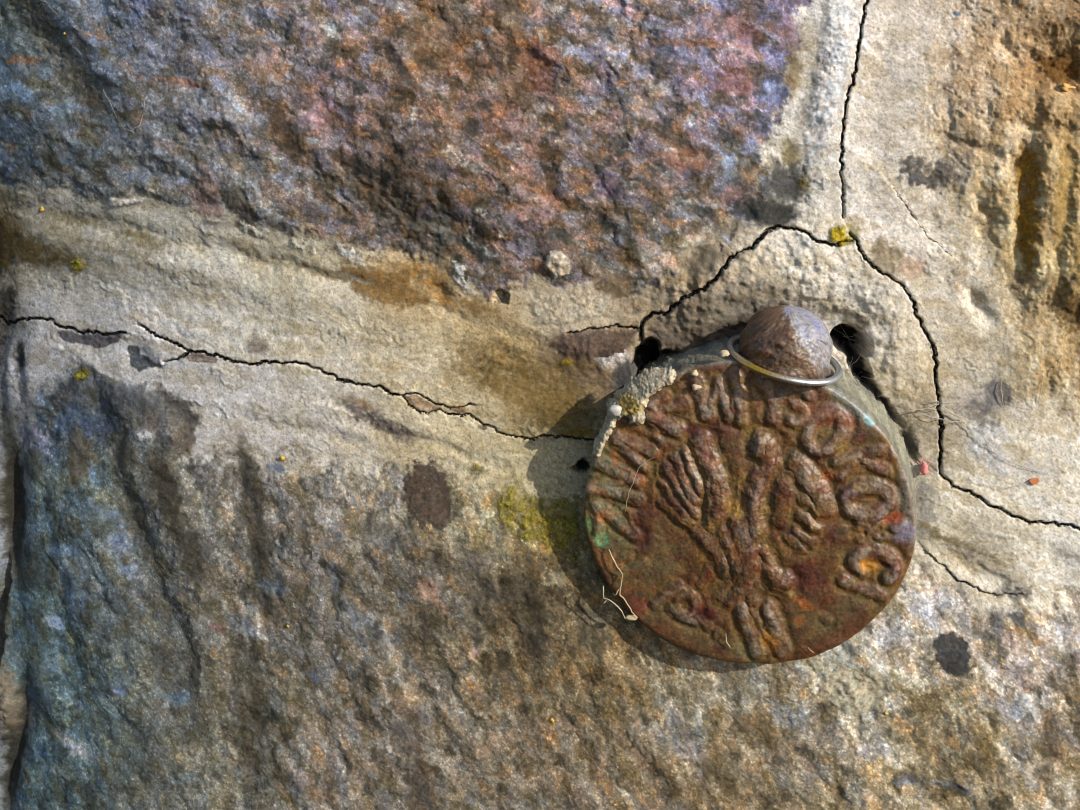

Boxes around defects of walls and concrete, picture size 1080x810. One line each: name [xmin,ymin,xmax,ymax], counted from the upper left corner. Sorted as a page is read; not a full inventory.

crack [566,0,1080,531]
crack [3,316,594,441]
crack [930,555,1024,596]